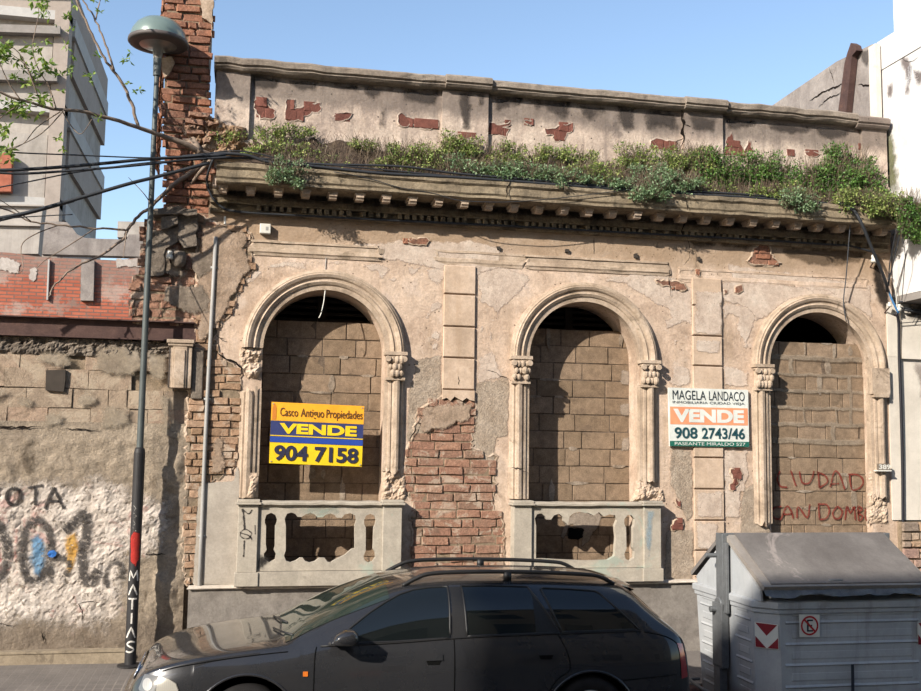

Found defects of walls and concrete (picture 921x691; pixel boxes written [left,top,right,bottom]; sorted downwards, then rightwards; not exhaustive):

crack [811,69,869,108]
spalling [252,96,323,123]
spalling [397,112,440,131]
damp [460,94,484,129]
damp [496,96,523,110]
spalling [523,118,574,142]
damp [619,107,634,128]
crack [676,110,690,146]
damp [692,116,714,130]
damp [770,124,848,139]
peeling [600,238,872,353]
spalling [381,332,509,567]